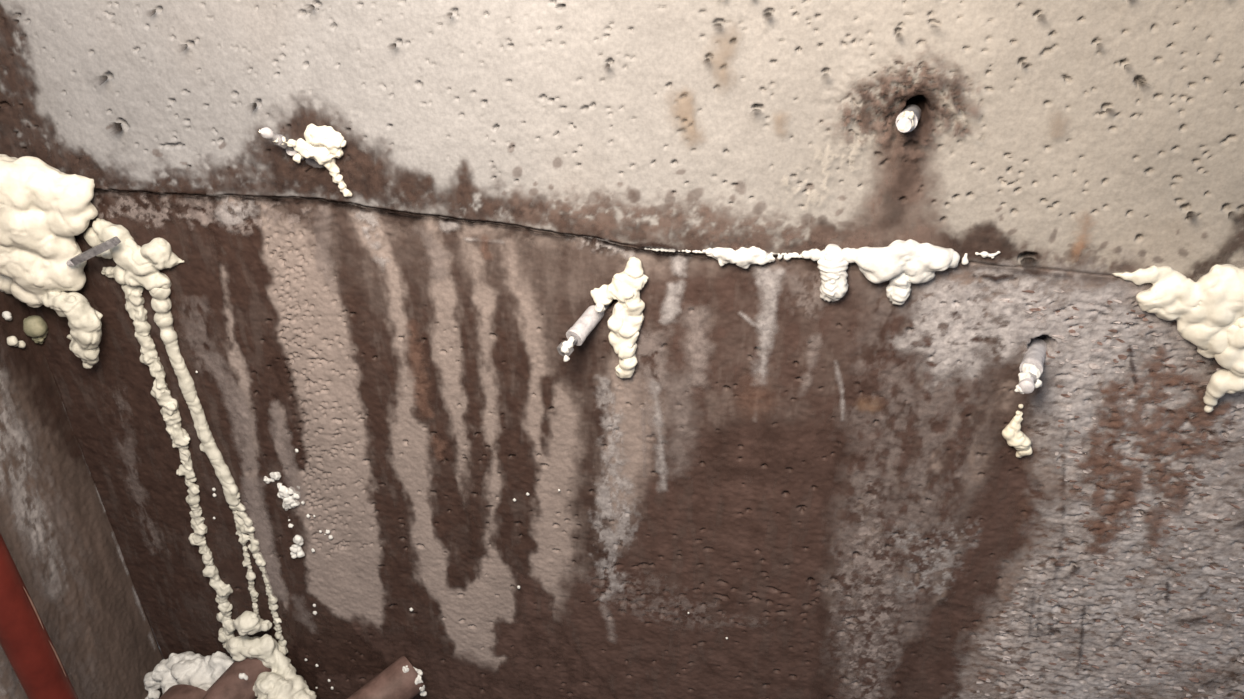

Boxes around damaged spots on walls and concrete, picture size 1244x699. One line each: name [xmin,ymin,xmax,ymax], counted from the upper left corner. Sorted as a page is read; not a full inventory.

crack [94,190,709,257]
damp [674,205,771,257]
damp [778,138,1018,270]
crack [963,266,1101,281]
damp [1110,263,1137,273]
damp [1187,214,1244,282]
damp [279,106,687,589]
damp [1171,352,1225,390]
damp [0,256,232,659]
damp [142,287,278,643]
damp [997,414,1015,442]
damp [1020,393,1033,434]